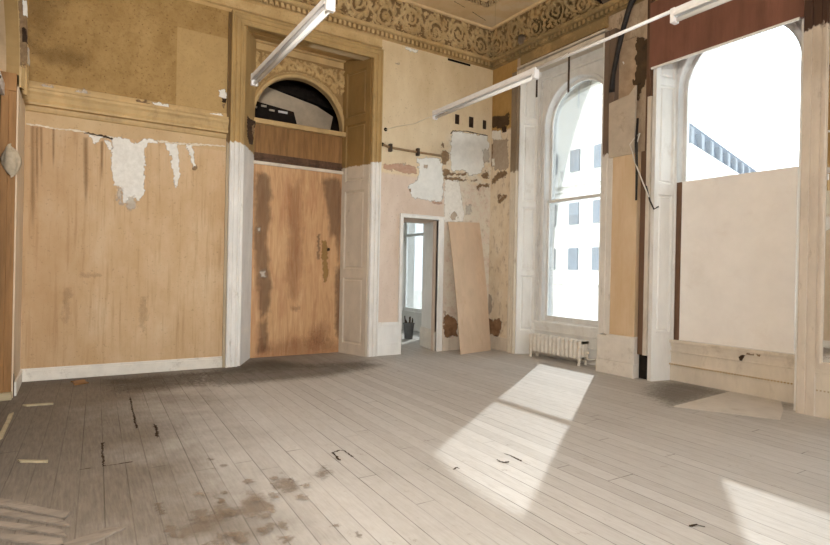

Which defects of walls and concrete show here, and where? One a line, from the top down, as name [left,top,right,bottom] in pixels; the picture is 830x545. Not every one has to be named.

peeling [89,135,197,209]
water stain [255,175,270,312]
water stain [325,180,341,236]
flaking render [383,126,509,222]
water stain [317,234,340,330]
spalling [443,311,458,338]
spalling [488,294,502,337]
water stain [165,477,308,543]